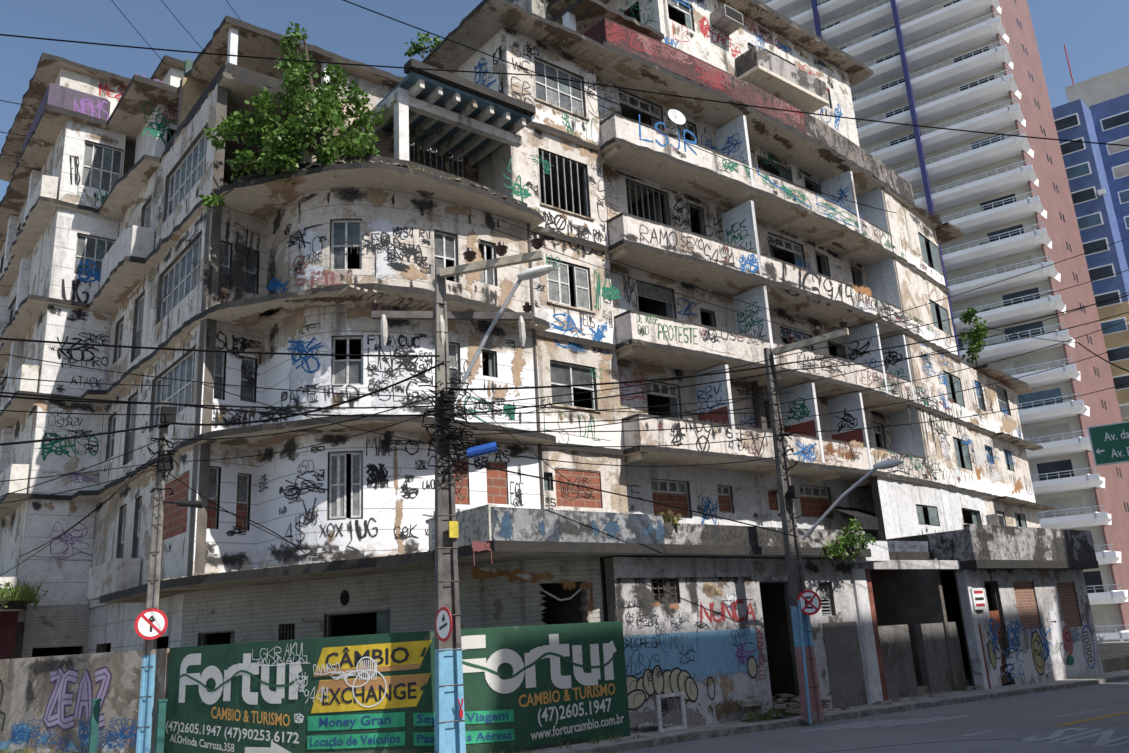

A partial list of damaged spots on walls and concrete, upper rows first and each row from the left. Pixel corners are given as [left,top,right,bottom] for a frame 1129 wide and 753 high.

water stain [536,40,609,89]
peeling [596,85,623,116]
spalling [612,62,698,110]
spalling [718,0,862,83]
water stain [744,16,847,83]
water stain [802,108,895,182]
water stain [497,511,513,541]
water stain [538,520,620,540]
water stain [644,519,784,545]
water stain [799,531,861,547]
peeling [470,566,595,625]
water stain [26,657,74,710]